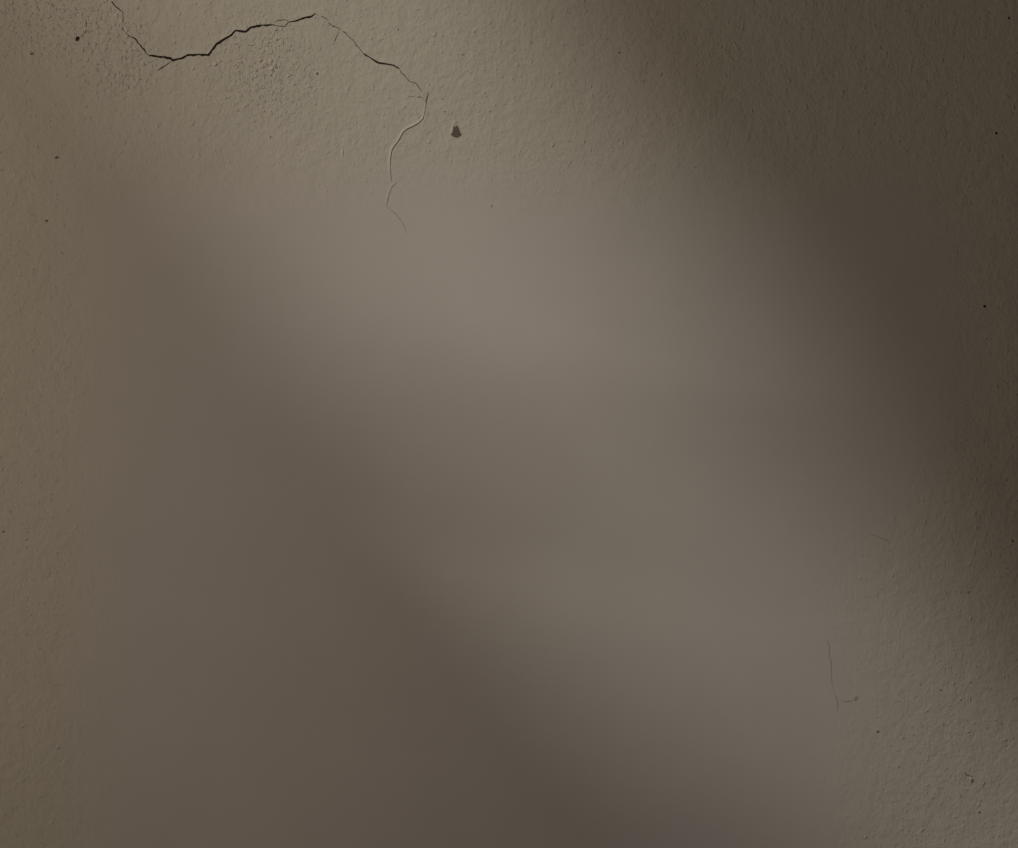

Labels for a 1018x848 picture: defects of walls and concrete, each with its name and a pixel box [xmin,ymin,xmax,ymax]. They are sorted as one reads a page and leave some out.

crack [75,0,429,233]